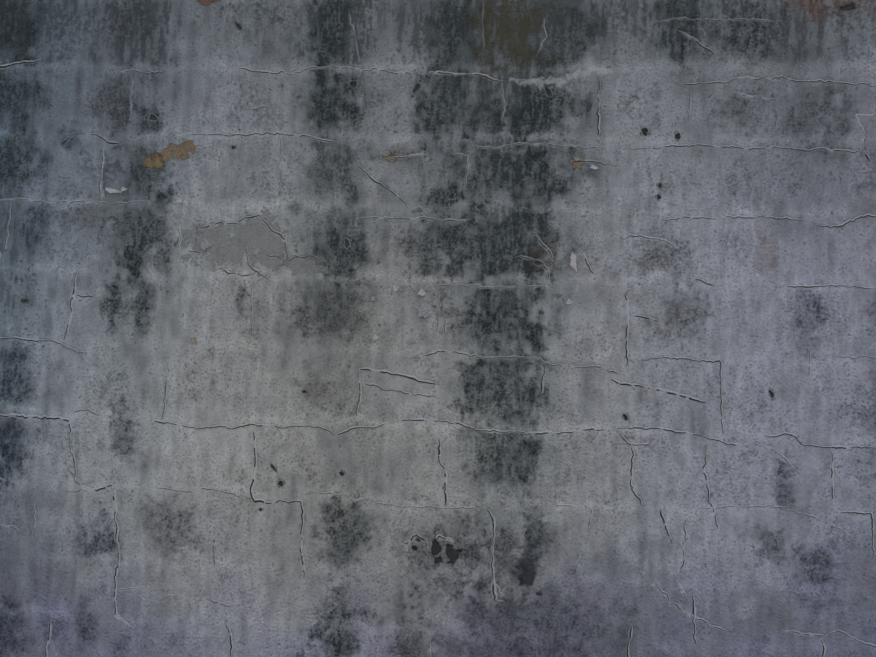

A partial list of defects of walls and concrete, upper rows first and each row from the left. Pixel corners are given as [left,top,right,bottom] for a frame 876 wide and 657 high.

leakage [114,210,169,327]
spalling [143,140,195,169]
leakage [309,0,359,127]
crack [236,9,507,122]
leakage [451,289,542,351]
leakage [420,147,574,278]
leakage [416,68,591,142]
crack [450,74,876,190]
crack [613,213,876,248]
crack [0,408,134,631]
spalling [403,533,461,563]
crack [150,289,876,647]